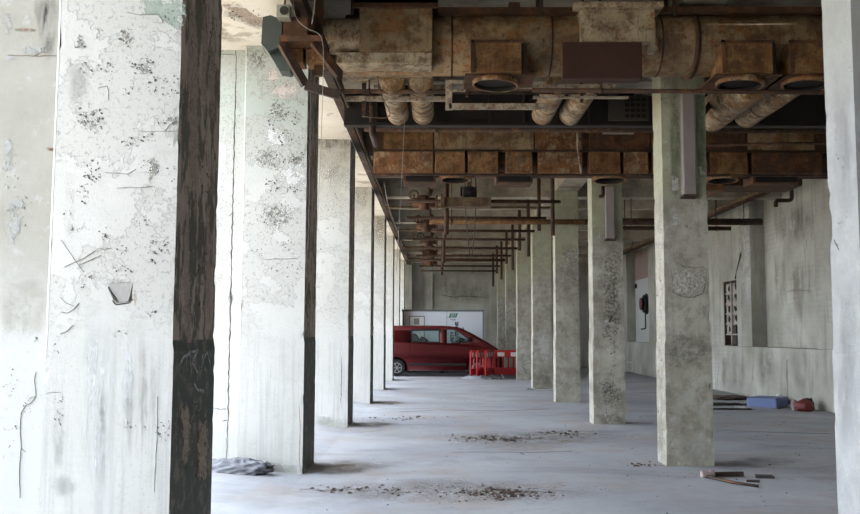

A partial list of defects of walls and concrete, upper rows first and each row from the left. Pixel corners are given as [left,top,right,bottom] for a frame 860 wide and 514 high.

peeling [125,58,179,97]
spalling [107,265,133,305]
crack [19,373,52,487]